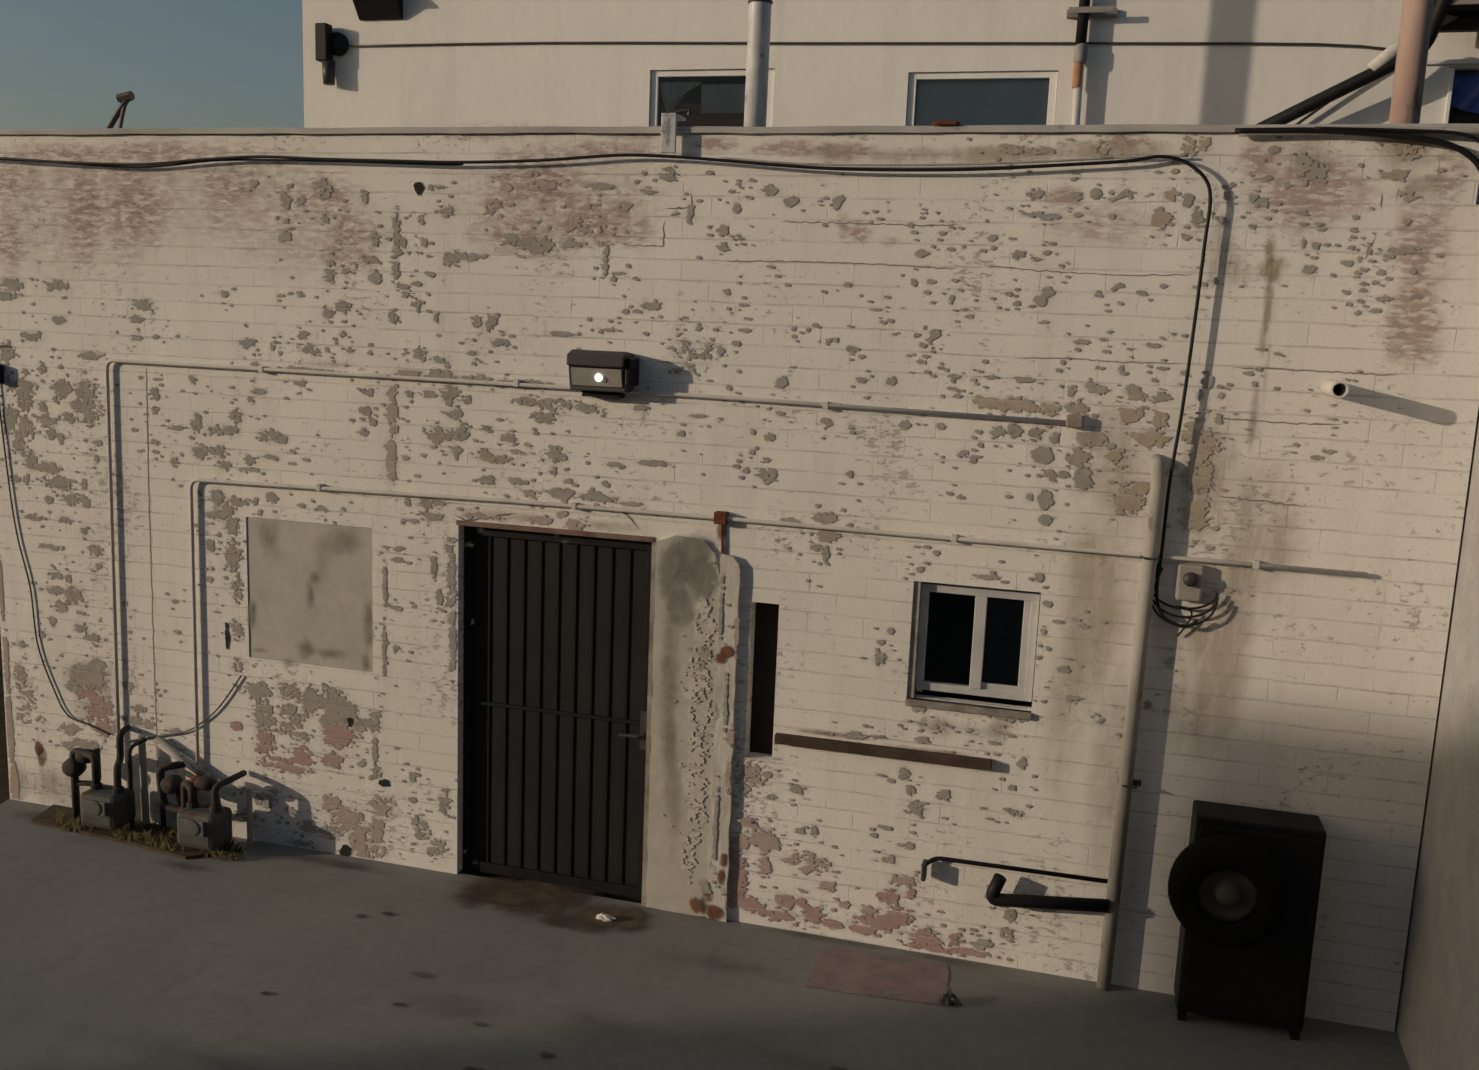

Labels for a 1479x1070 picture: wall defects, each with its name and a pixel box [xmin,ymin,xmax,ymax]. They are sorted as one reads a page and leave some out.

peeling [1358,135,1465,226]
damp [1262,243,1280,334]
peeling [785,133,1443,551]
peeling [0,157,845,862]
damp [659,536,715,621]
peeling [774,470,869,587]
peeling [903,540,949,580]
peeling [1028,554,1107,660]
peeling [1033,658,1121,737]
peeling [660,560,1037,961]
corrosion [689,853,726,920]